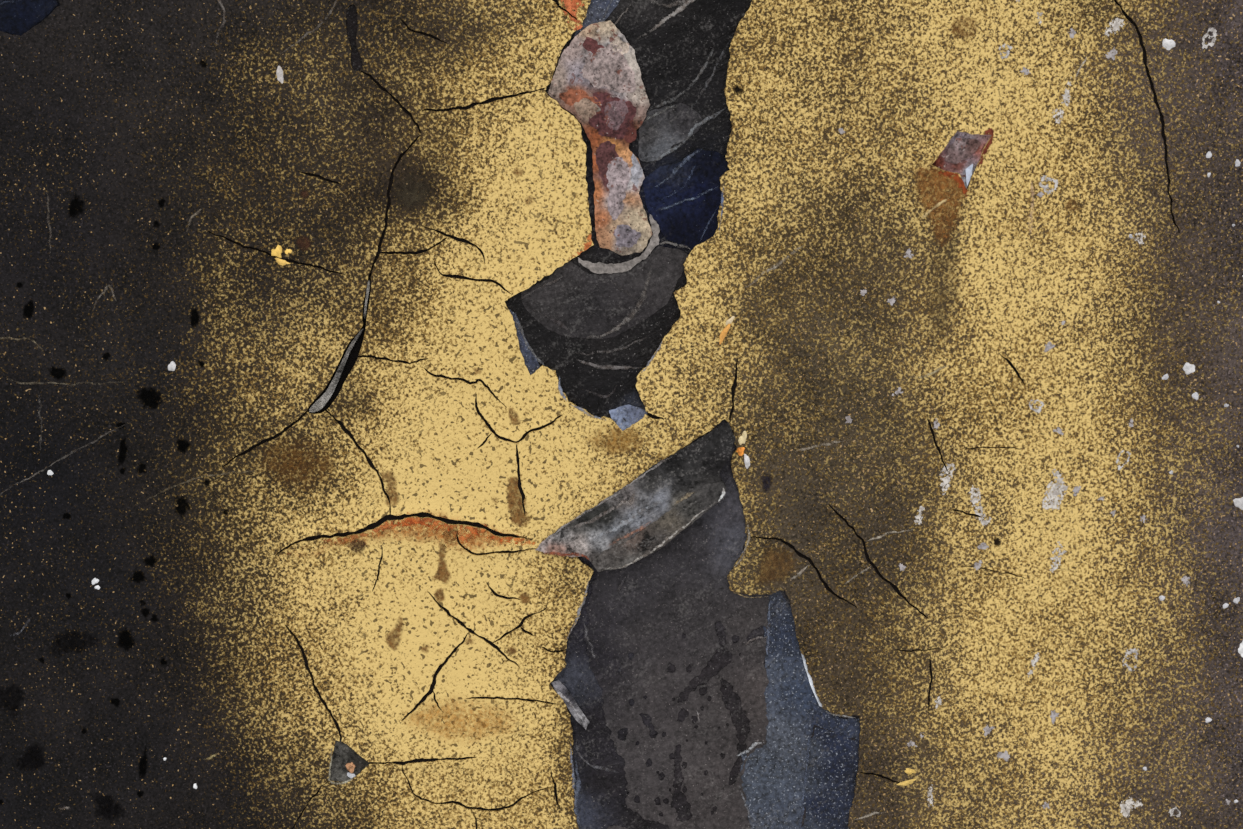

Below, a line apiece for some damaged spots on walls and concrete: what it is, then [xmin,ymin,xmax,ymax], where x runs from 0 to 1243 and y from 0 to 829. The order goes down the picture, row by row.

peeling [0,0,61,35]
crack [552,0,577,20]
corrosion [548,0,660,274]
crack [1114,0,1179,231]
peeling [505,0,752,430]
crack [209,71,563,720]
corrosion [324,513,535,552]
peeling [535,419,860,829]
crack [750,536,855,606]
crack [286,625,342,740]
peeling [328,740,371,785]
crack [371,757,560,829]